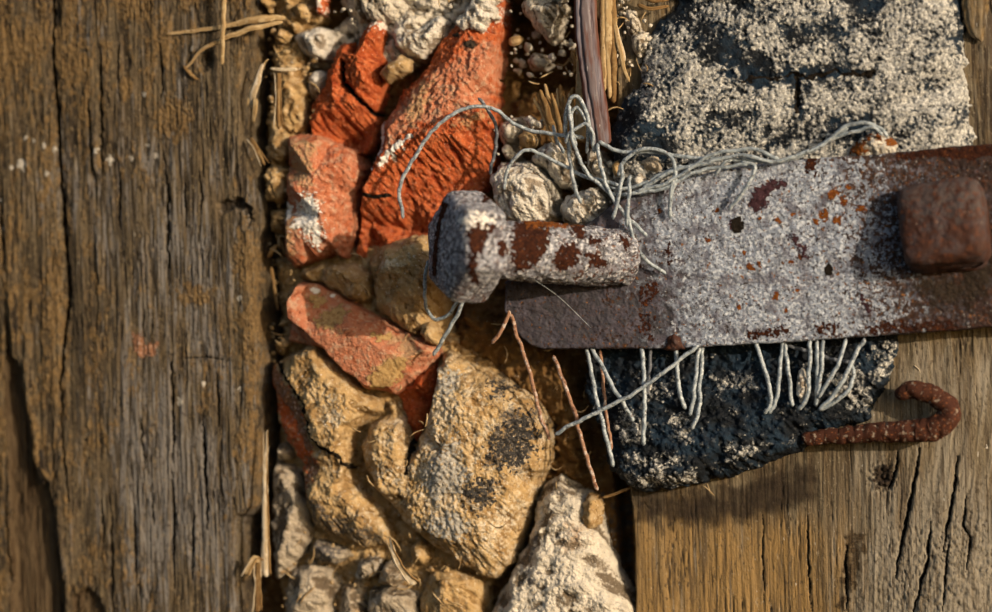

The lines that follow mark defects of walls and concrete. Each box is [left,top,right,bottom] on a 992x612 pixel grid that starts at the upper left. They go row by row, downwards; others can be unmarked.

crack [87,33,122,226]
corrosion [804,158,818,178]
corrosion [896,144,992,161]
crack [52,0,73,502]
corrosion [465,219,632,285]
corrosion [774,213,810,265]
corrosion [747,325,789,341]
corrosion [813,320,840,336]
corrosion [865,319,962,335]
crack [888,448,971,612]